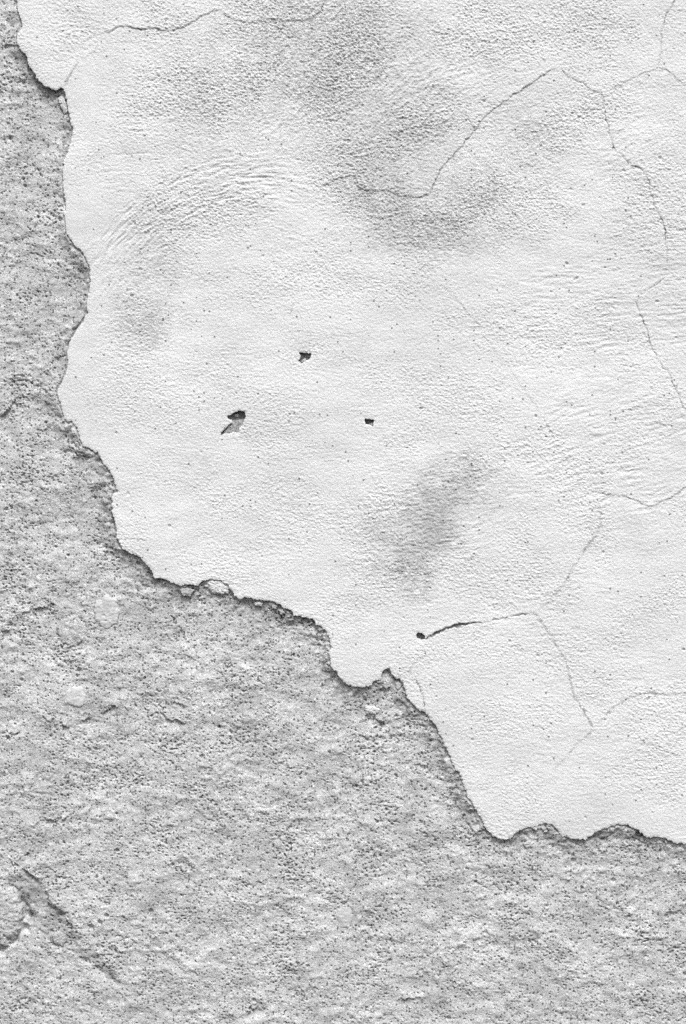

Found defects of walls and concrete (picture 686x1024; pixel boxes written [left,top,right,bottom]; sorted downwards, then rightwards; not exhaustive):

spalling [15,1,91,420]
spalling [221,411,246,435]
spalling [77,430,644,848]
crack [425,613,526,639]